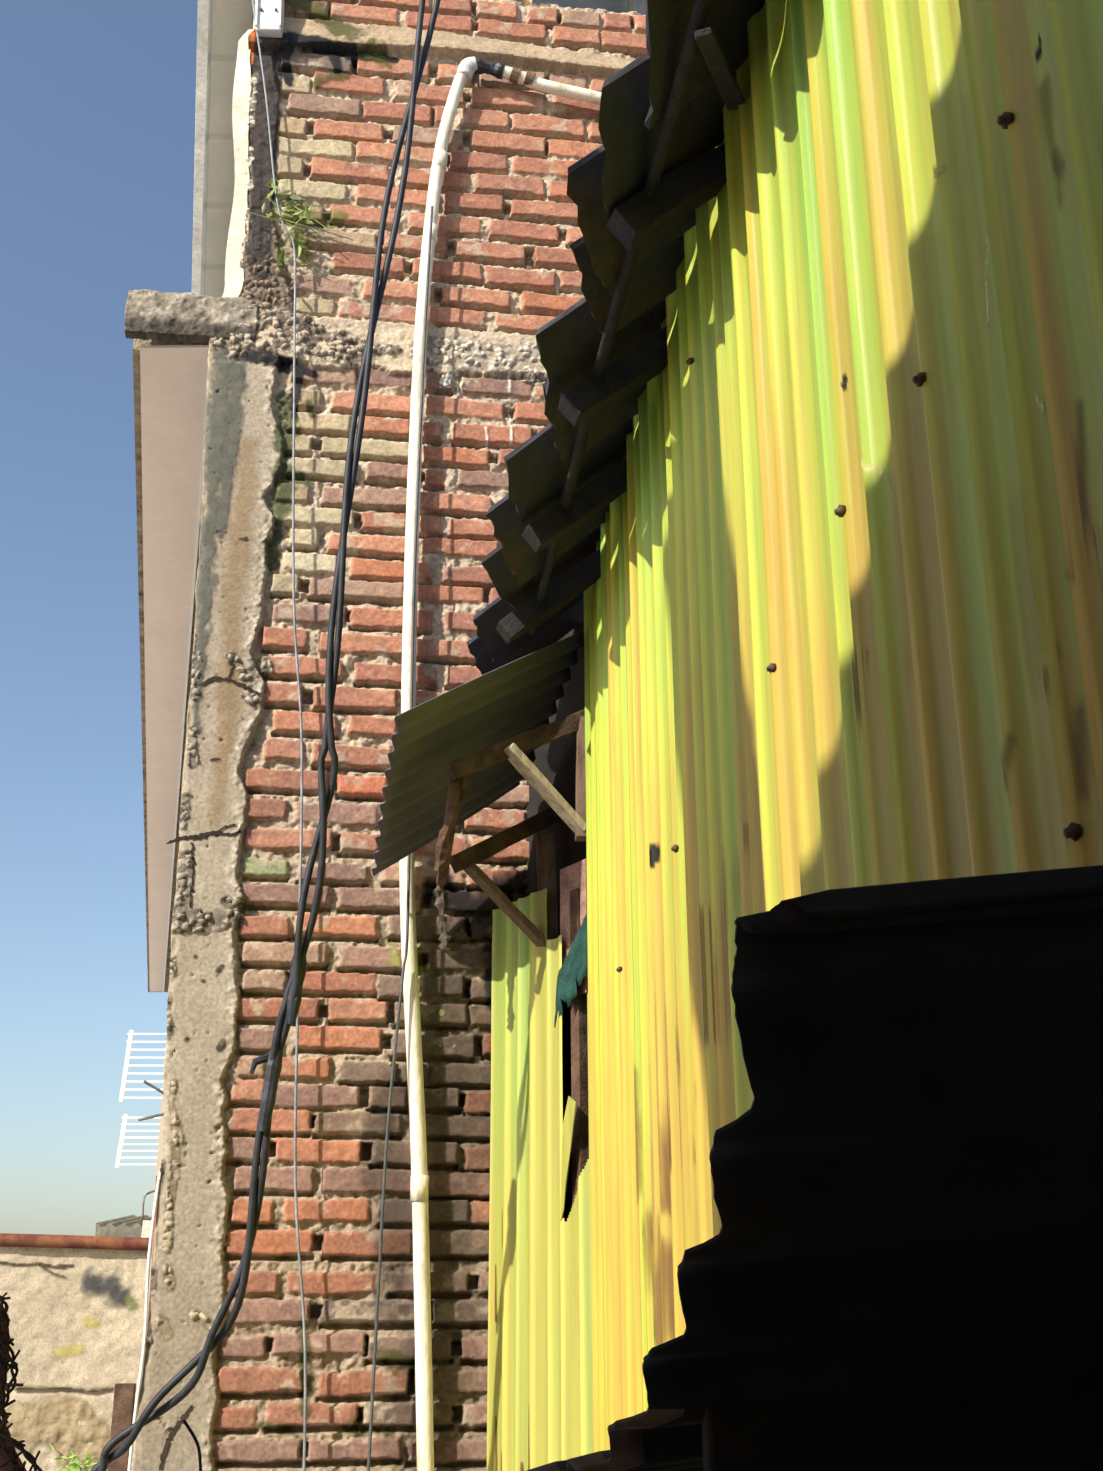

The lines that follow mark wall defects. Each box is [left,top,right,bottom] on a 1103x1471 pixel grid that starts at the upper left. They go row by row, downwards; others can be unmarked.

crack [193,633,259,695]
crack [166,824,242,909]